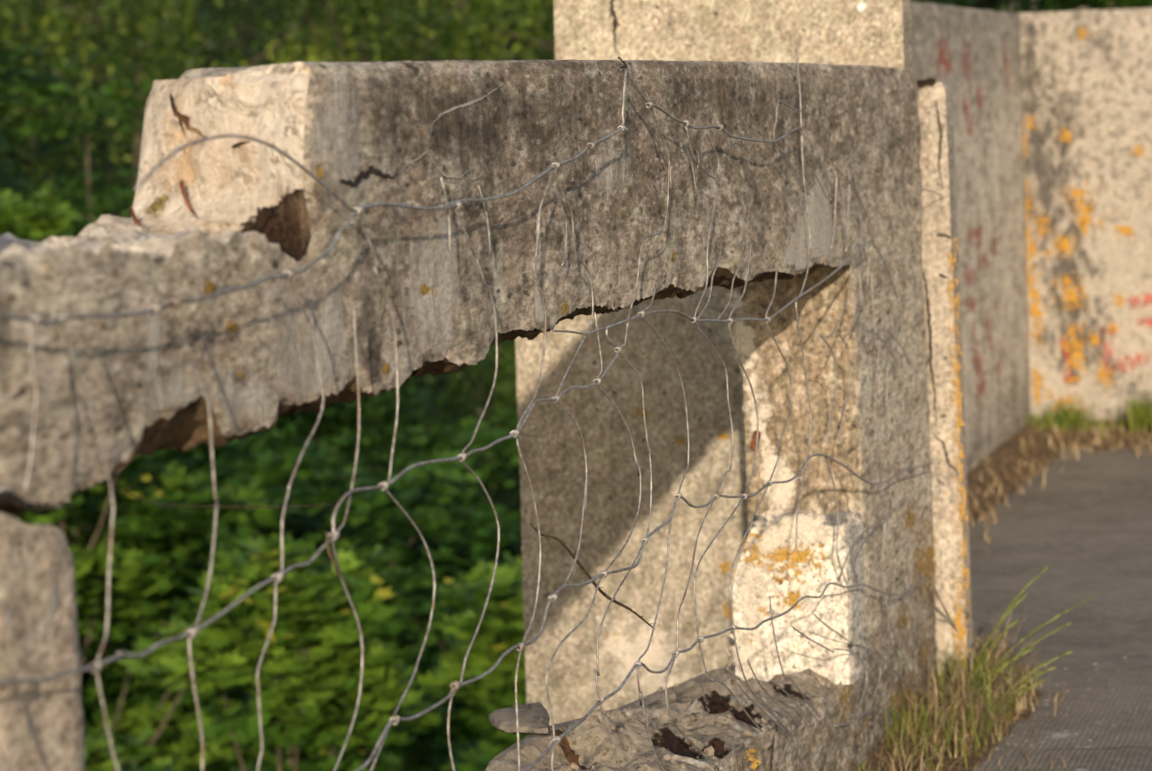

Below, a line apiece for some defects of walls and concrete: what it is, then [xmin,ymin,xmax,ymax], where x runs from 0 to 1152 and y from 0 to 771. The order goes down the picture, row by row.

crack [610,0,629,83]
crack [340,85,502,202]
crack [935,100,943,188]
spalling [240,163,337,262]
peeling [381,210,465,392]
peeling [490,169,855,679]
crack [923,271,959,482]